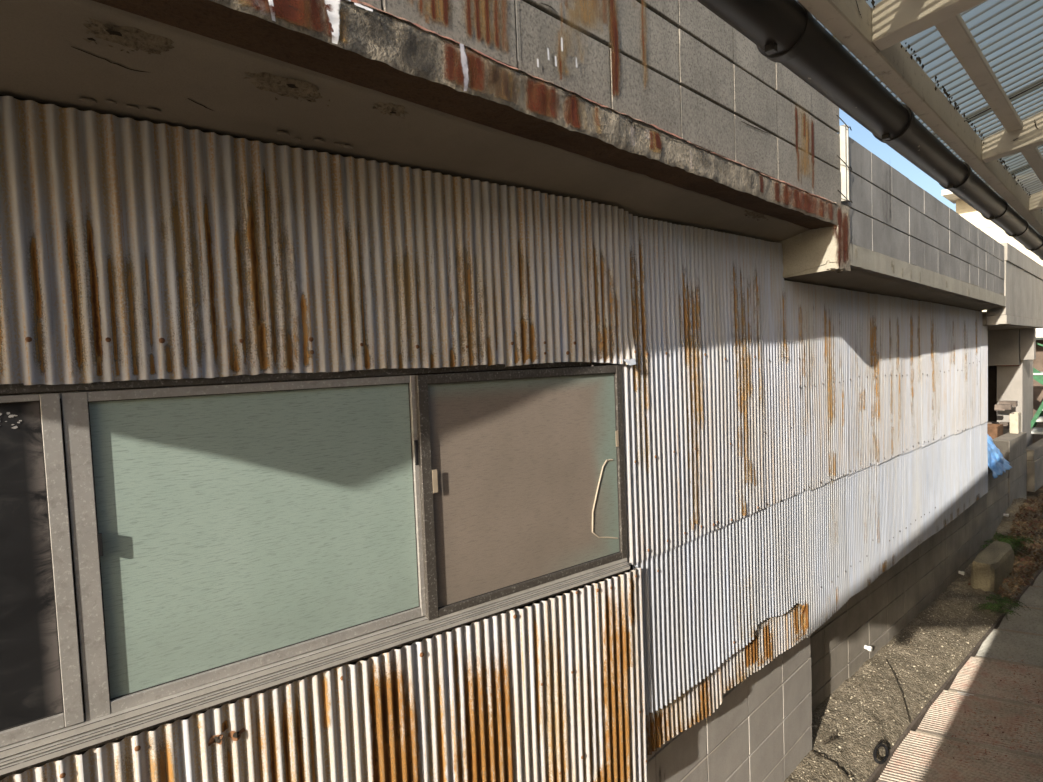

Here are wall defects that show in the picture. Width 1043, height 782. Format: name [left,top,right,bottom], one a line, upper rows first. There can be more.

corrosion [66,170,311,376]
corrosion [337,226,372,369]
corrosion [385,253,434,369]
corrosion [679,269,704,529]
corrosion [733,268,765,516]
corrosion [149,744,174,782]
corrosion [211,720,233,782]
corrosion [256,676,330,782]
corrosion [369,643,514,782]
corrosion [534,619,570,782]
corrosion [588,577,635,782]
corrosion [646,578,774,755]